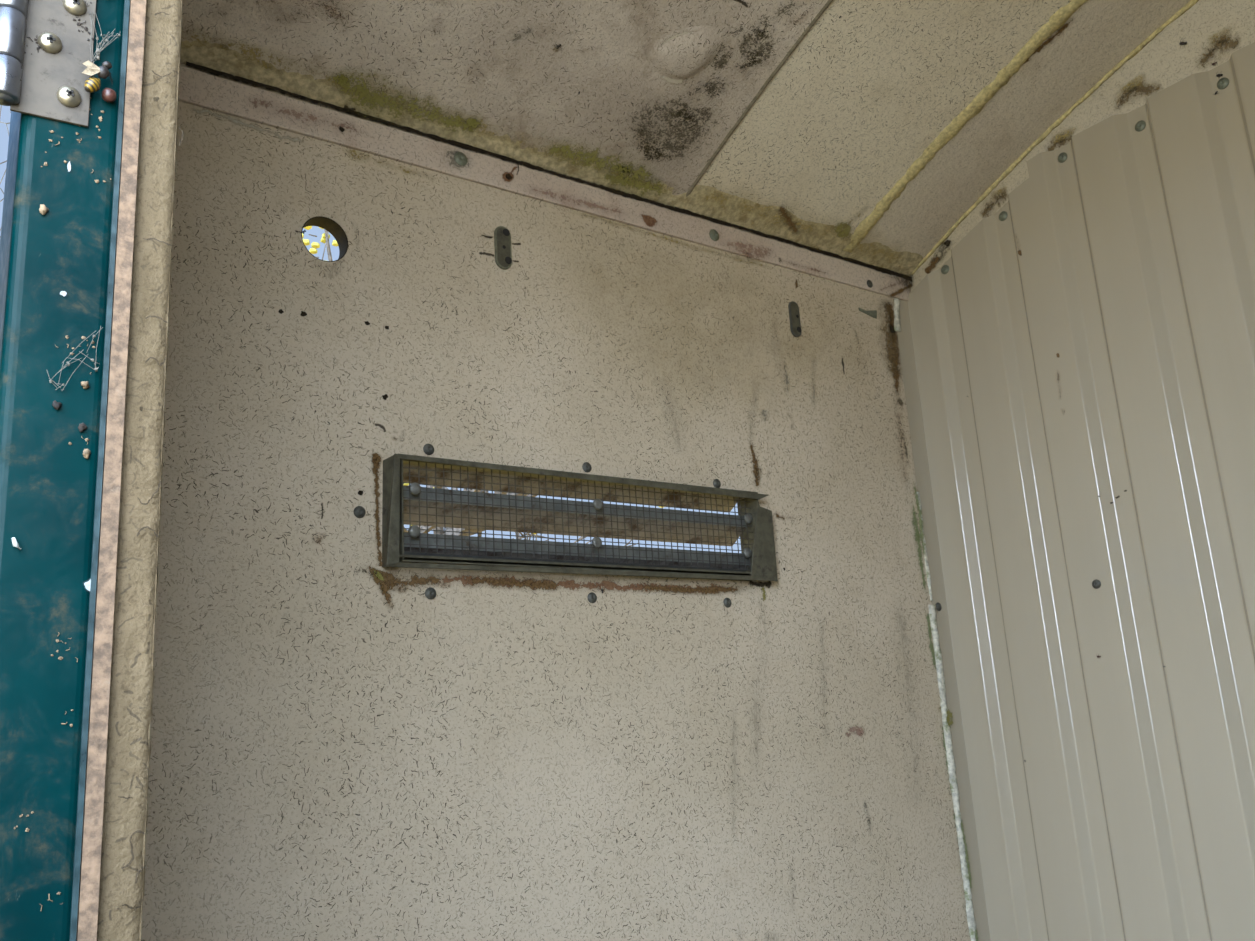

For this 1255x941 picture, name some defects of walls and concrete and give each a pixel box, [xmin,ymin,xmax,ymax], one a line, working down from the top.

leakage [1024,19,1073,64]
leakage [1199,35,1239,67]
leakage [625,3,806,164]
leakage [1116,77,1160,109]
leakage [1048,131,1072,151]
leakage [980,189,1007,217]
leakage [881,240,951,479]
rust [434,574,771,601]